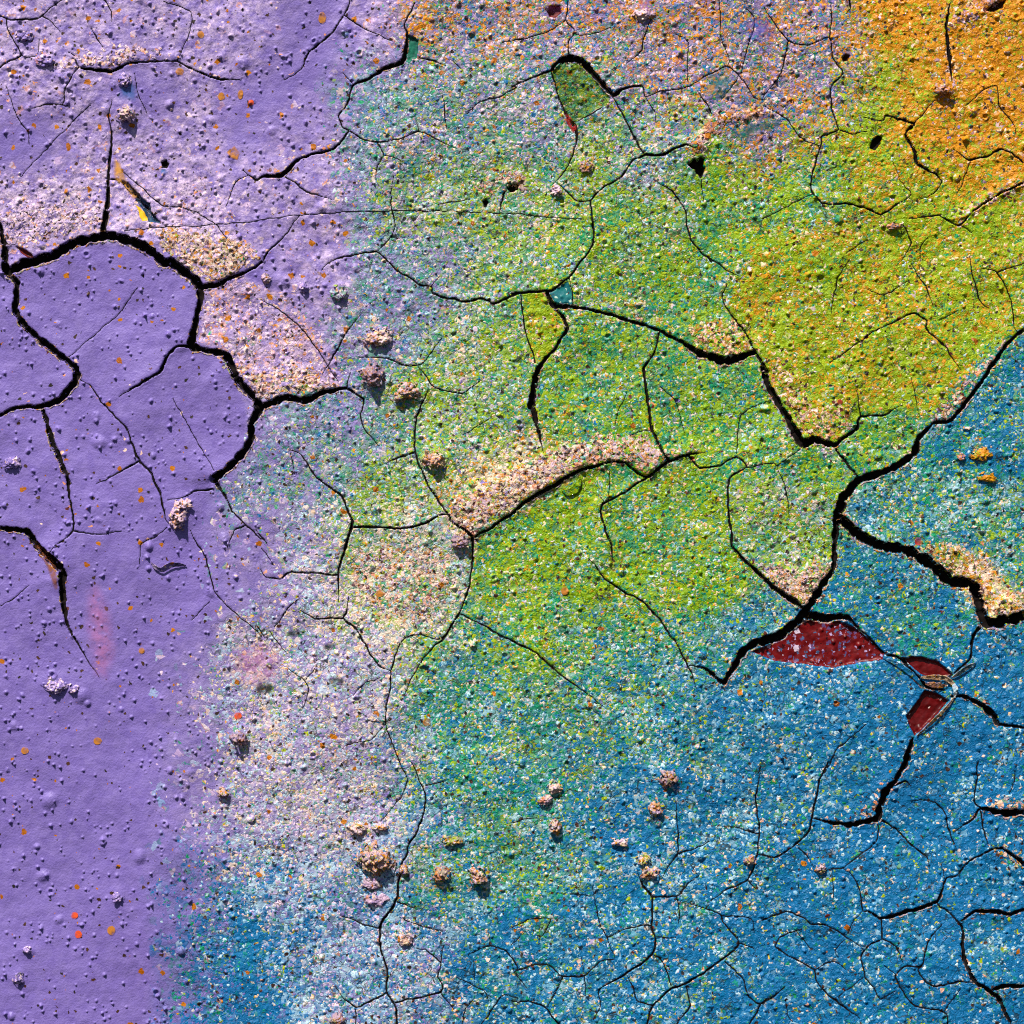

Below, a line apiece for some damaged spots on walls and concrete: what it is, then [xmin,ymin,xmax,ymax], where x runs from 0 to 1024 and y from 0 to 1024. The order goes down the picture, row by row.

crack [0,0,241,177]
crack [0,101,378,677]
crack [226,0,1024,1024]
spalling [753,620,976,736]